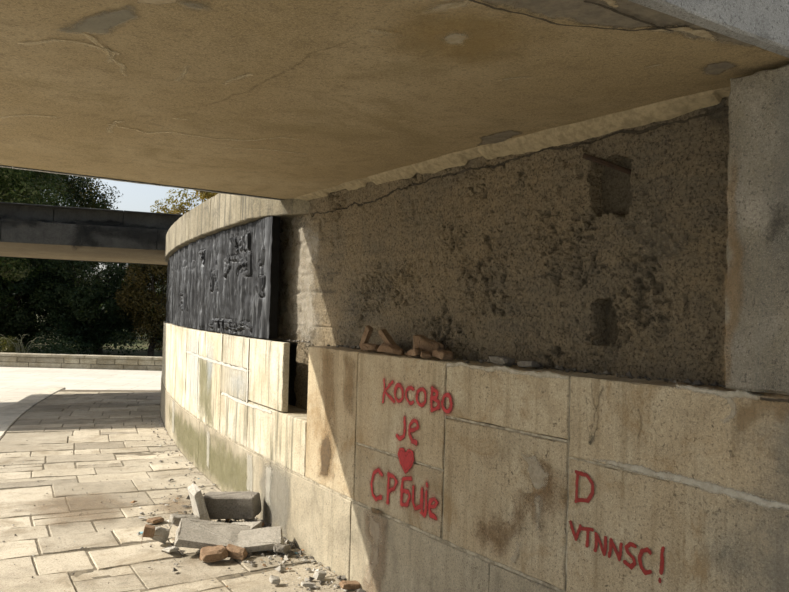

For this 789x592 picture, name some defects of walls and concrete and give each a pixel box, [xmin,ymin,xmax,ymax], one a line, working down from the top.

spalling [481,0,755,47]
peeling [293,86,731,201]
crack [312,106,729,217]
spalling [582,153,631,217]